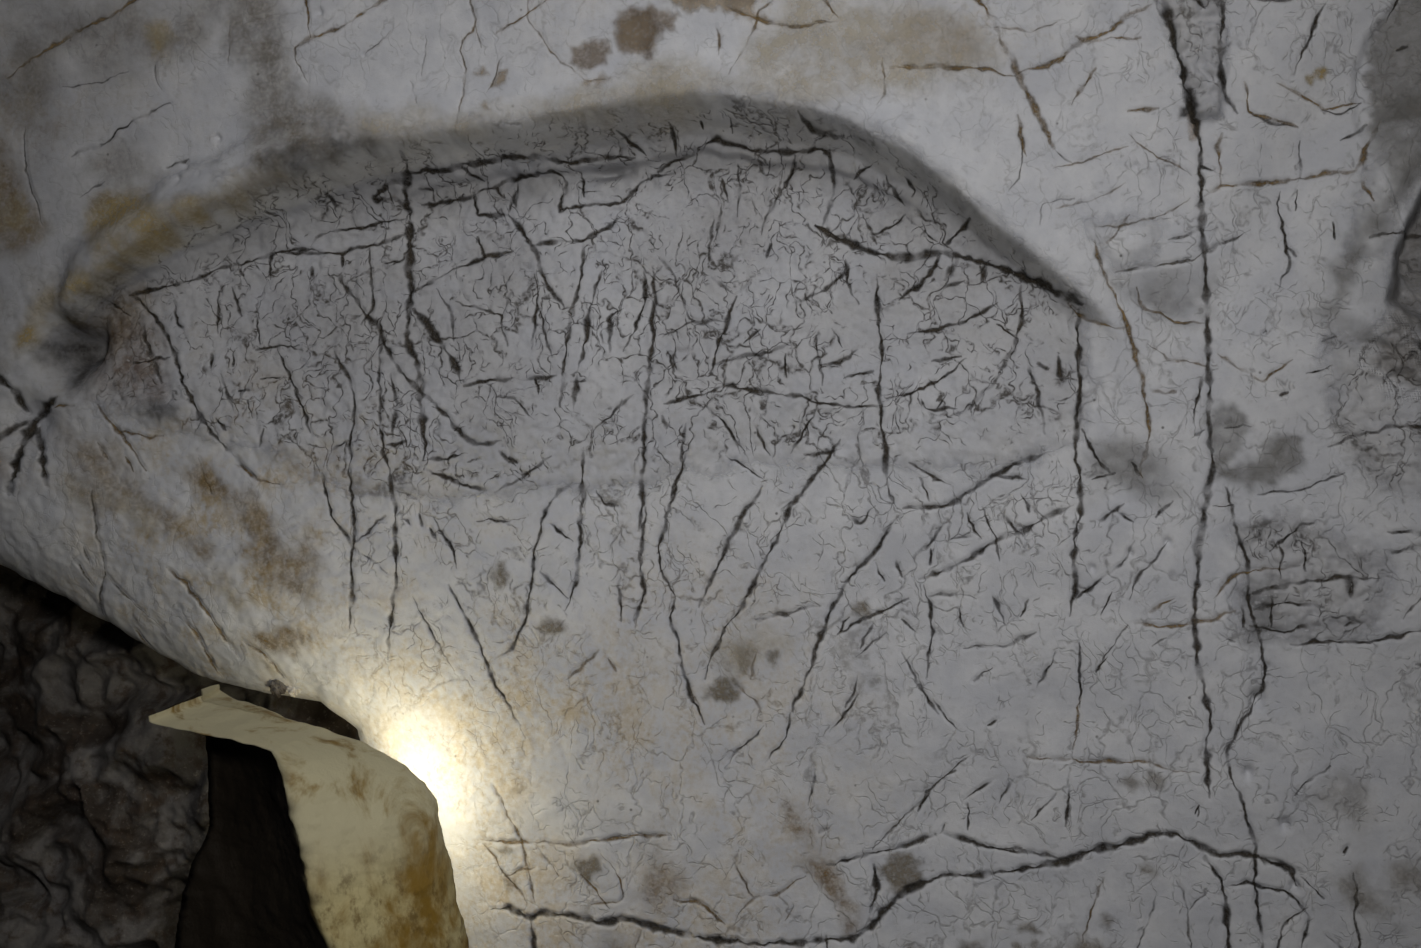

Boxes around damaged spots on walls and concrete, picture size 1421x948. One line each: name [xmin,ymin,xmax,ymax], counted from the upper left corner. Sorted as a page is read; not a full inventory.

damp [573,0,766,68]
crack [105,103,168,144]
crack [0,376,156,481]
crack [114,126,962,716]
crack [487,0,1421,948]
crack [78,500,283,675]